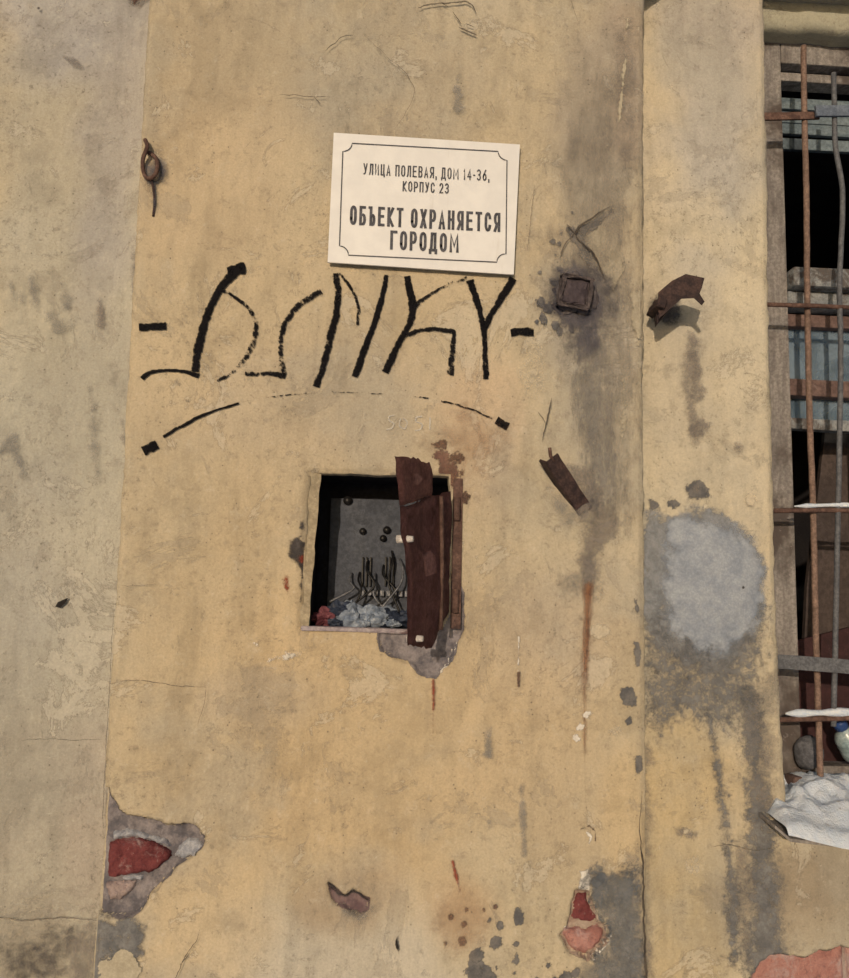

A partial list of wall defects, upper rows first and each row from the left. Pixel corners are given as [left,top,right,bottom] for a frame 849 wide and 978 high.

damp [550,195,630,588]
spalling [377,587,465,679]
corrosion [583,583,592,695]
crack [0,915,95,923]
spalling [94,788,205,978]
spalling [327,882,370,917]
peeling [464,907,524,978]
peeling [546,864,645,978]
spalling [749,946,849,978]